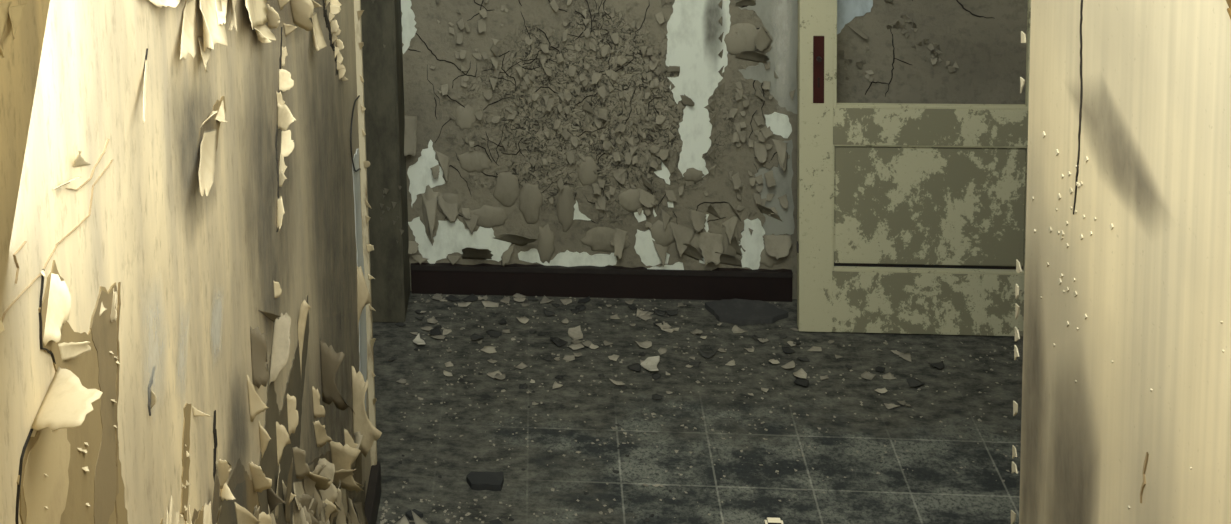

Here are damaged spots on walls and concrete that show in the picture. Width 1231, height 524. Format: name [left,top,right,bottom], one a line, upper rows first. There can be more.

peeling [0,1,26,58]
peeling [148,0,792,524]
crack [408,0,662,223]
crack [651,173,744,232]
crack [749,80,777,171]
peeling [15,260,128,524]